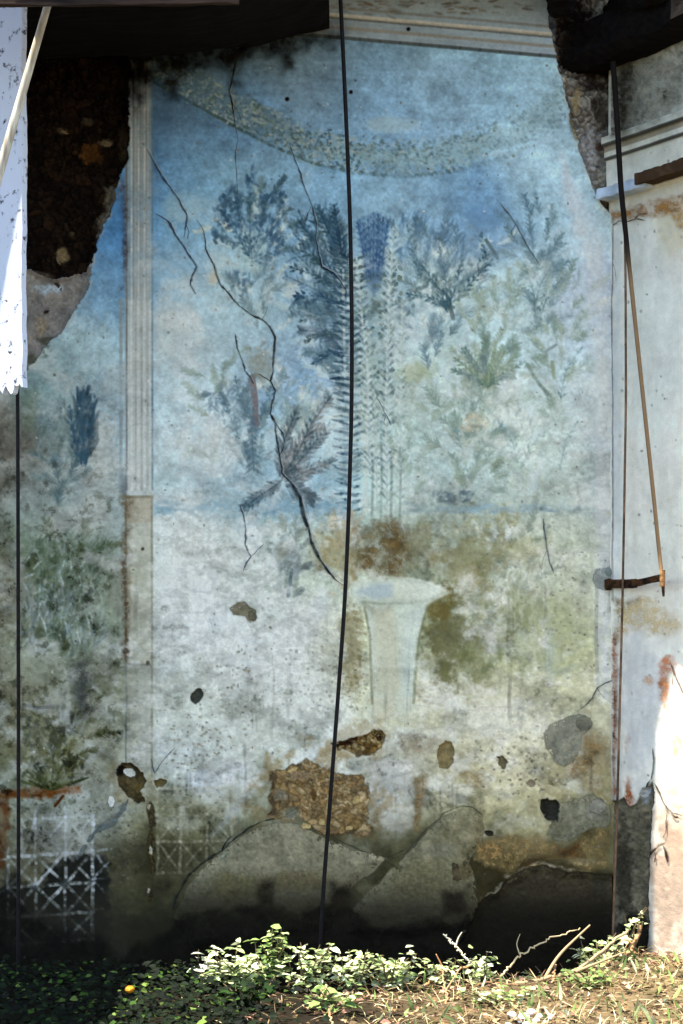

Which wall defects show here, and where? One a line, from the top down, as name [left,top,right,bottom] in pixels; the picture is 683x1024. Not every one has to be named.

crack [229,59,241,194]
flaking render [549,0,609,212]
flaking render [26,56,132,369]
crack [147,143,347,585]
corrosion [650,657,671,707]
spalling [331,730,385,757]
flaking render [108,763,167,873]
crack [172,819,273,910]
water stain [0,872,471,988]
crack [337,806,482,867]
water stain [476,830,609,870]
flaking render [459,782,655,984]